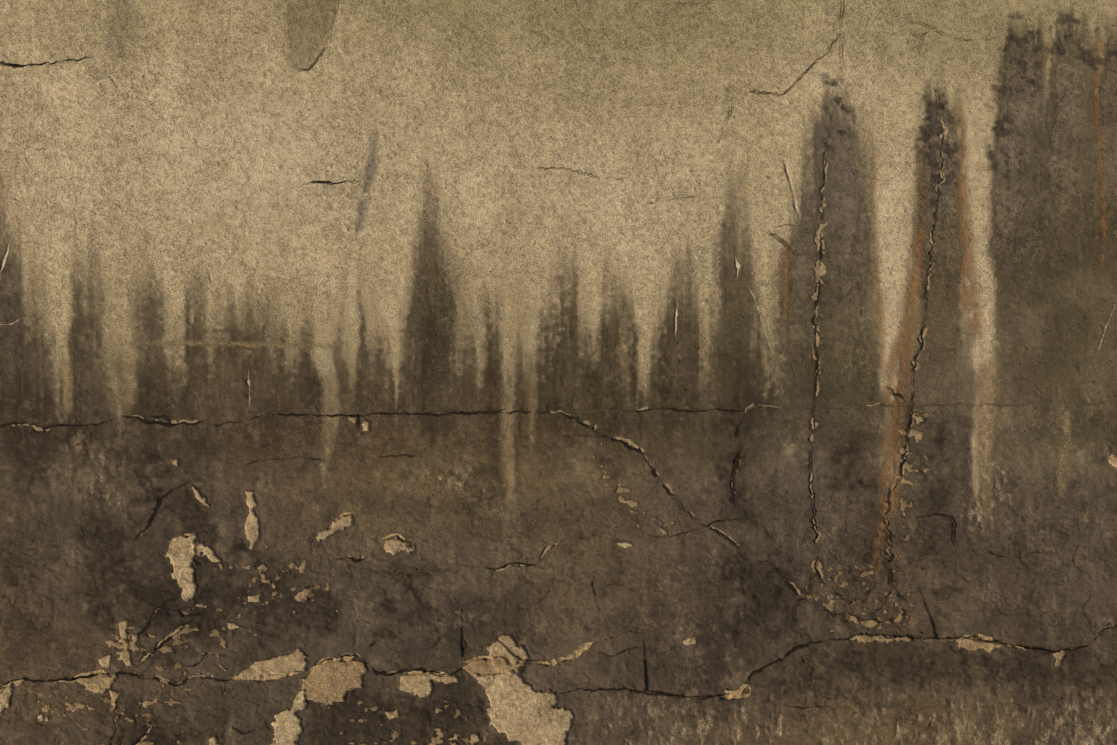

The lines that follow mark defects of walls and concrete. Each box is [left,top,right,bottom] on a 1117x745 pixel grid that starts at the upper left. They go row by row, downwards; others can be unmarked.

crack [0,48,91,67]
crack [719,0,852,141]
leakage [0,13,1117,544]
crack [0,420,111,432]
crack [122,92,1117,690]
crack [110,452,188,569]
leakage [83,491,245,637]
leakage [254,560,342,646]
peeling [37,491,574,745]
peeling [806,554,927,643]
peeling [0,677,24,712]
crack [542,687,727,706]